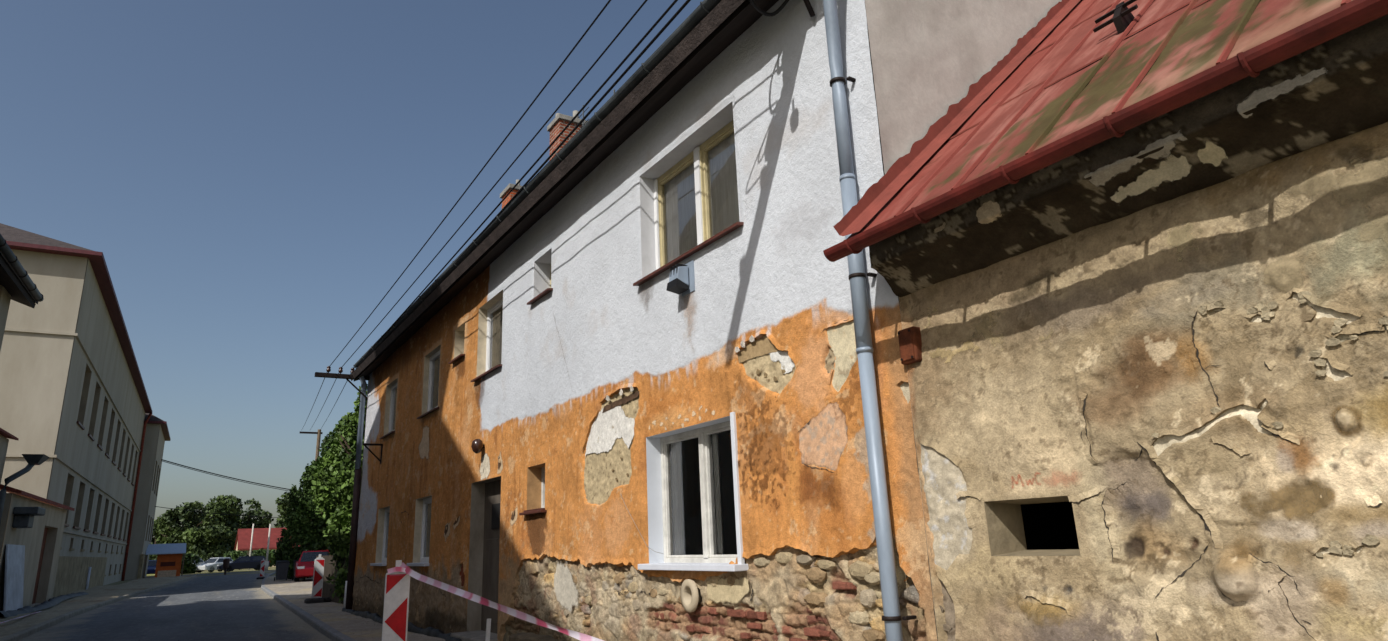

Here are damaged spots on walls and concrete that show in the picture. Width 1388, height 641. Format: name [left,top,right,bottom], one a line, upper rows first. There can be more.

peeling [1237,67,1327,118]
peeling [1084,130,1228,203]
flaking render [734,330,799,394]
flaking render [798,317,858,473]
crack [1185,309,1302,457]
flaking render [1243,288,1388,381]
crack [1348,323,1385,335]
flaking render [582,383,715,505]
flaking render [499,436,975,641]
crack [1068,392,1316,641]
water stain [1241,480,1335,519]
crack [1363,495,1382,507]